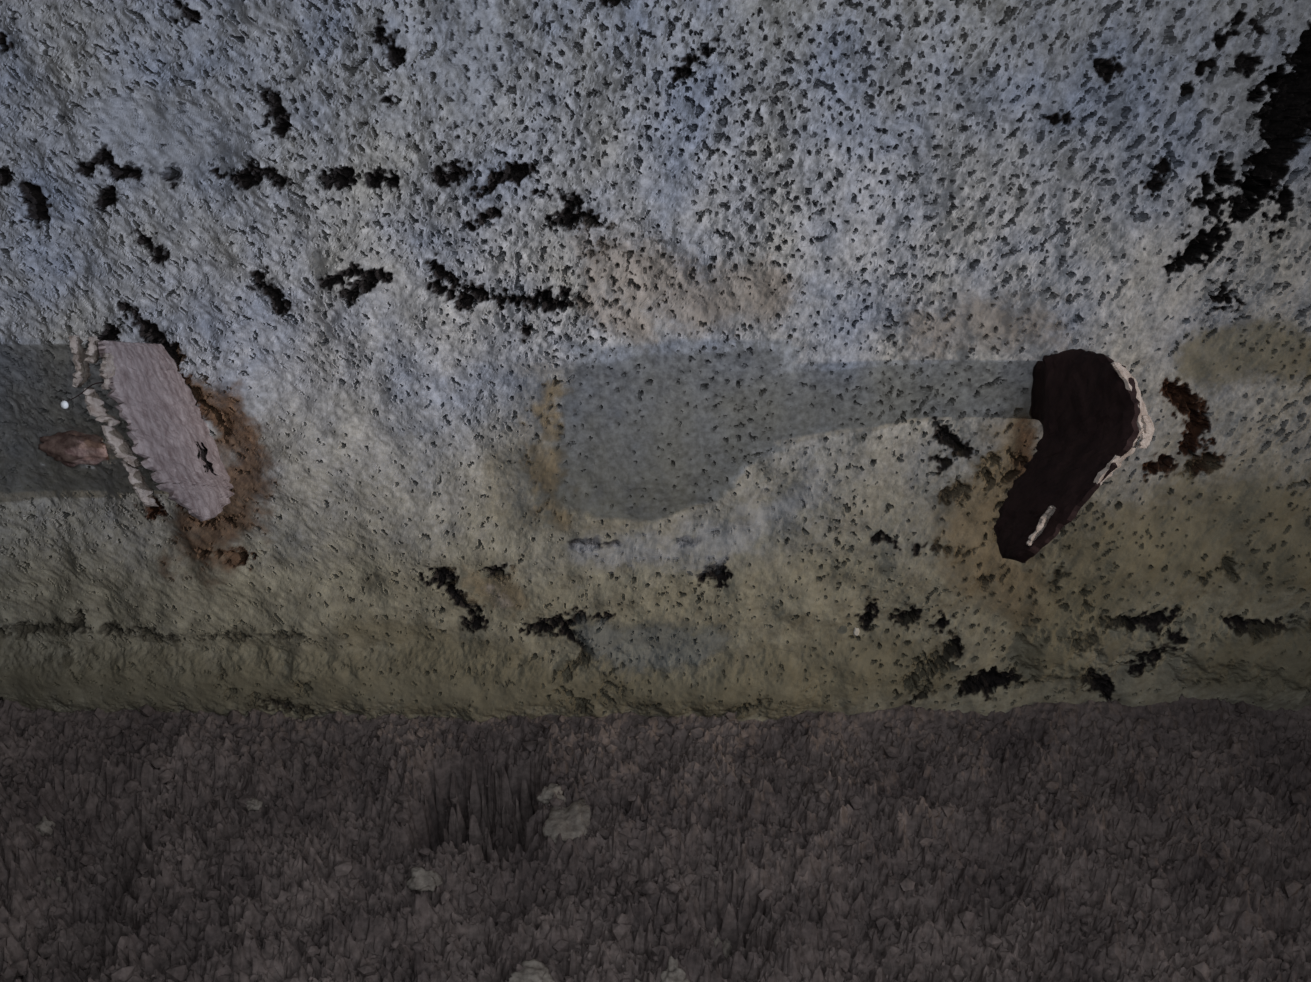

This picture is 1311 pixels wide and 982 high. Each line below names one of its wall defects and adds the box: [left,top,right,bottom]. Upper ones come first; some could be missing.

corrosion [68,335,159,507]
corrosion [177,383,272,570]